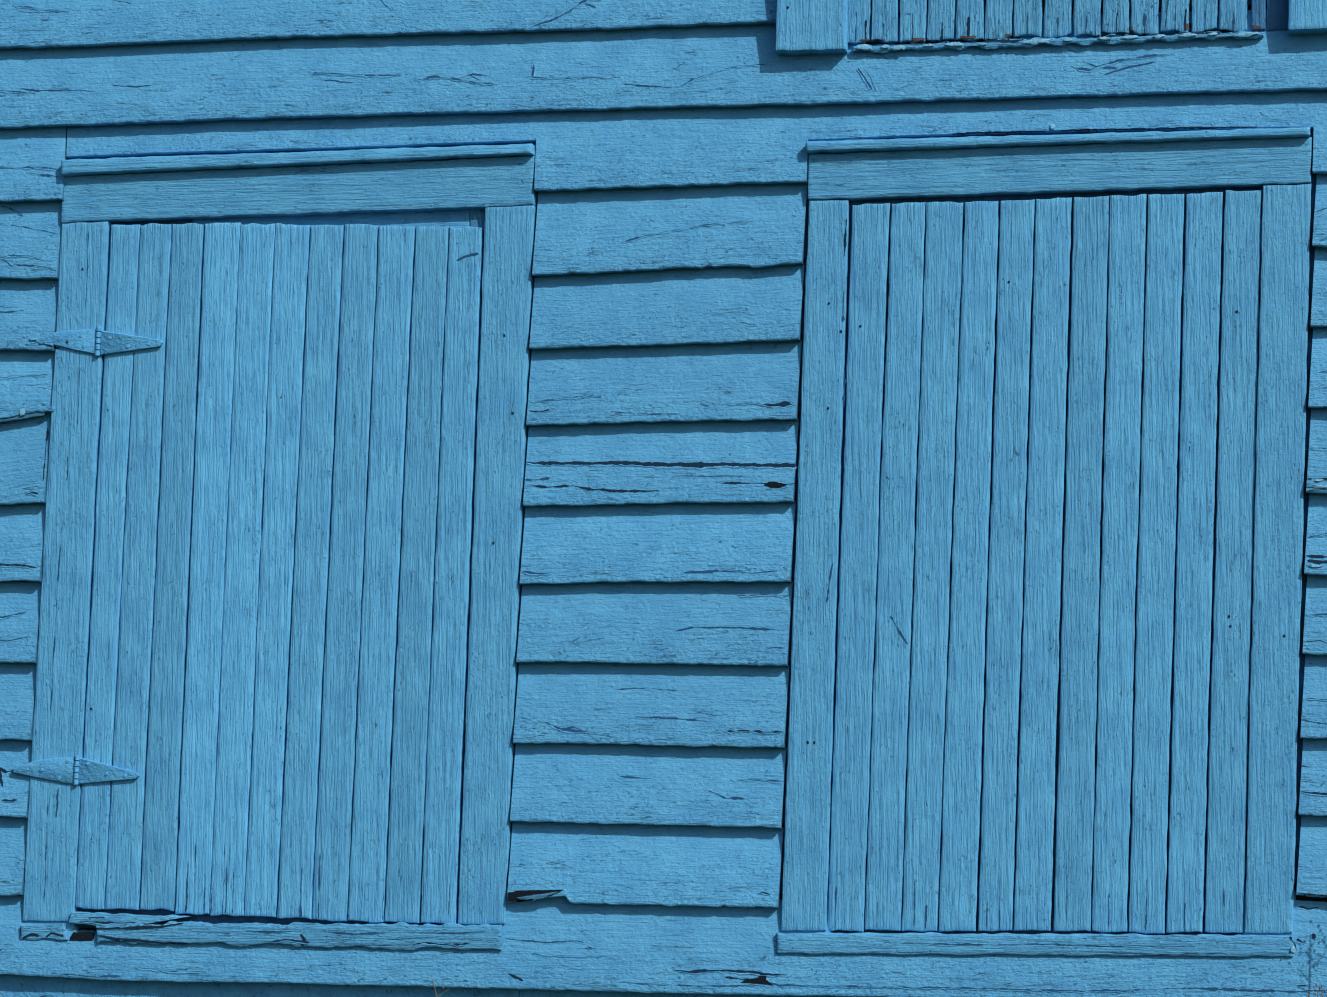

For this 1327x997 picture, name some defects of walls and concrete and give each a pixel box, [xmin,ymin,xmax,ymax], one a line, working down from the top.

crack [525,461,798,492]
crack [0,767,59,898]
spalling [507,890,562,902]